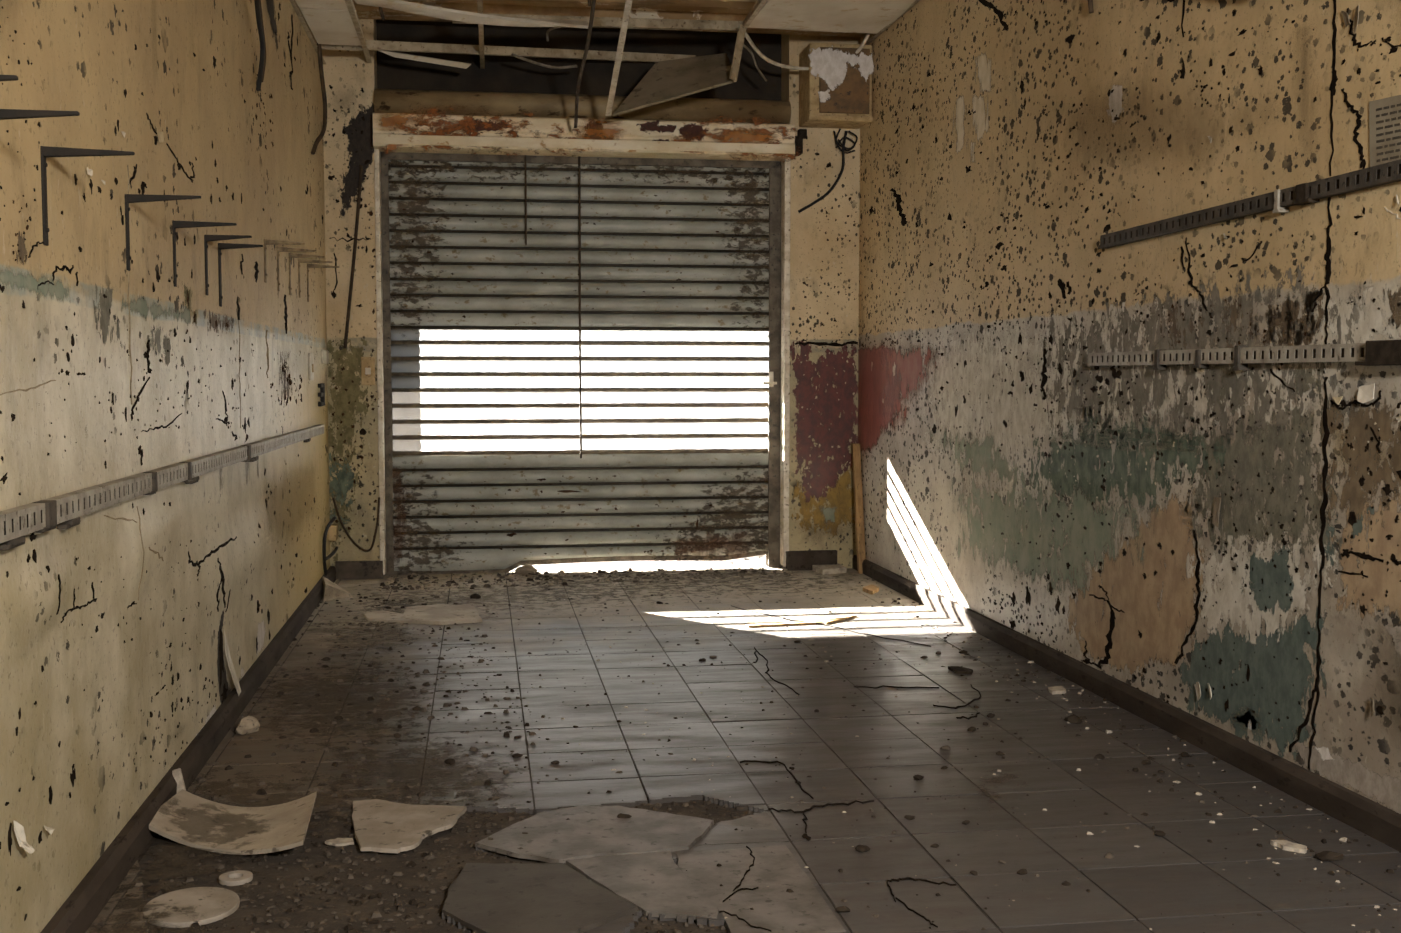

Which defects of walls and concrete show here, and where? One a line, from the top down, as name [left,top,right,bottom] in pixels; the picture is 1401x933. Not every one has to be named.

spalling [378,50,471,69]
corrosion [379,106,799,342]
peeling [808,45,874,103]
peeling [882,52,991,227]
flaking render [1037,72,1171,233]
peeling [1180,9,1278,107]
crack [1311,0,1366,344]
crack [56,506,237,643]
peeling [790,213,1401,814]
crack [1289,378,1401,769]
crack [740,760,874,841]
crack [719,846,771,932]